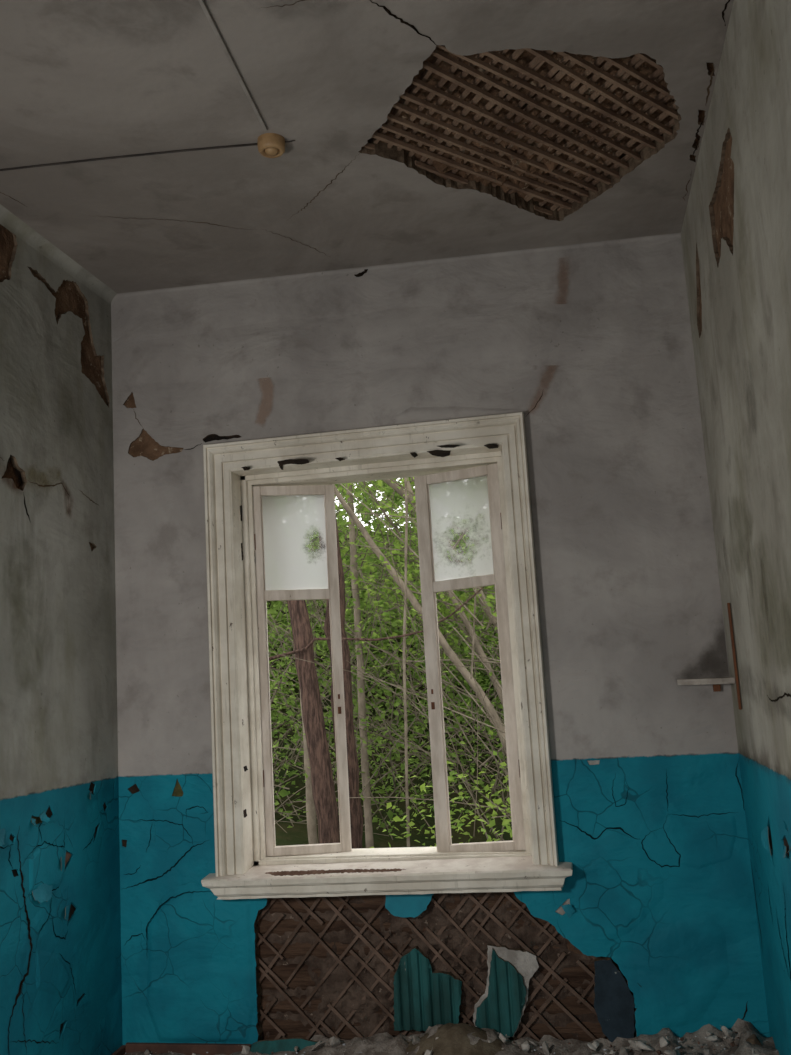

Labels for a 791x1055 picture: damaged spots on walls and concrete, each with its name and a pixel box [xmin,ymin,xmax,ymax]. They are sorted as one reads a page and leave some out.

crack [370,0,436,45]
flaking render [0,224,18,282]
flaking render [358,45,681,221]
crack [683,62,715,200]
flaking render [709,128,734,266]
flaking render [27,266,109,407]
flaking render [128,429,183,461]
crack [767,692,791,702]
crack [0,821,93,1051]
crack [121,806,211,955]
flaking render [254,892,609,1042]
crack [560,764,745,867]